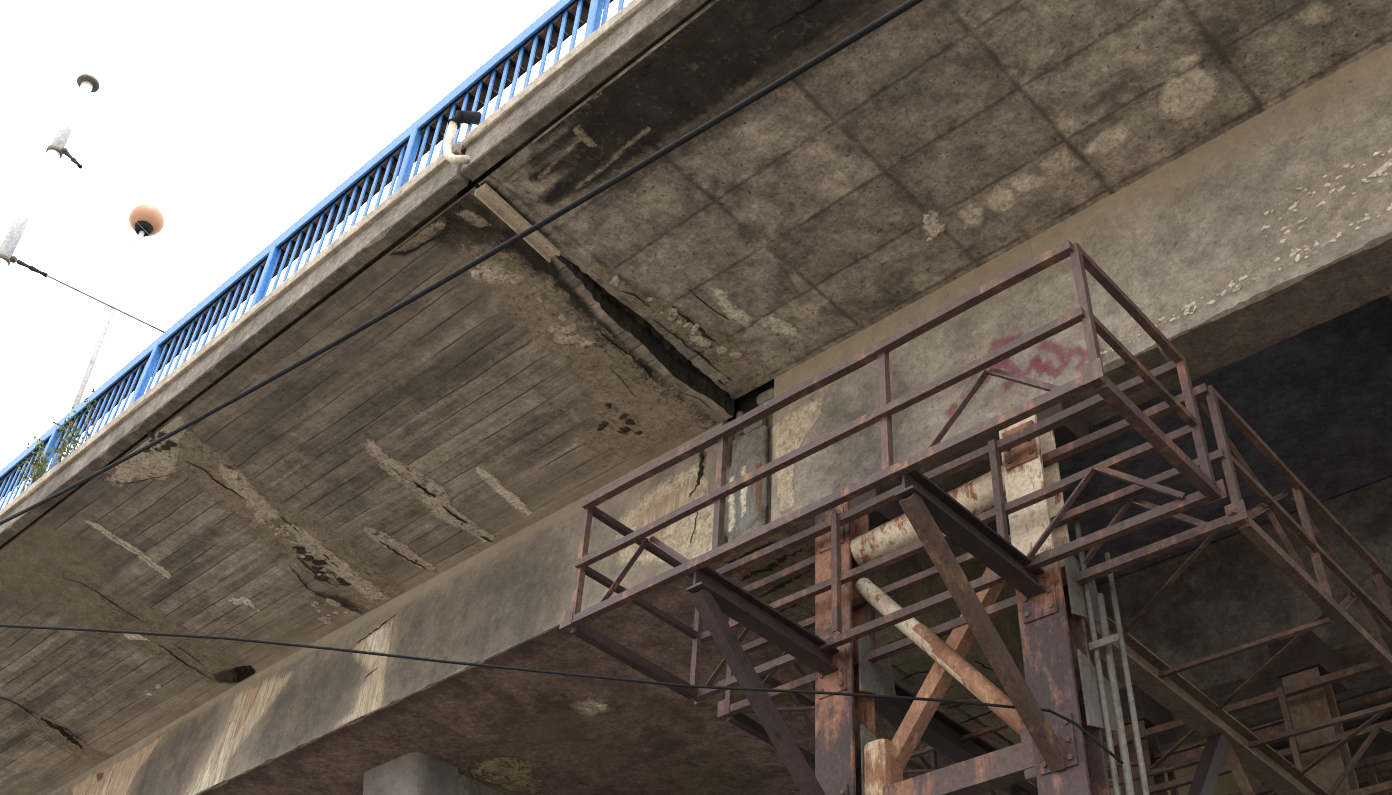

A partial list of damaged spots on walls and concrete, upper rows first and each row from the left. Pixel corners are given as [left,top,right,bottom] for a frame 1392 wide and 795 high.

water stain [529,0,909,205]
water stain [421,181,722,457]
spalling [574,253,803,392]
spalling [1100,144,1392,360]
spalling [105,413,187,488]
crack [689,450,706,543]
crack [0,697,110,764]